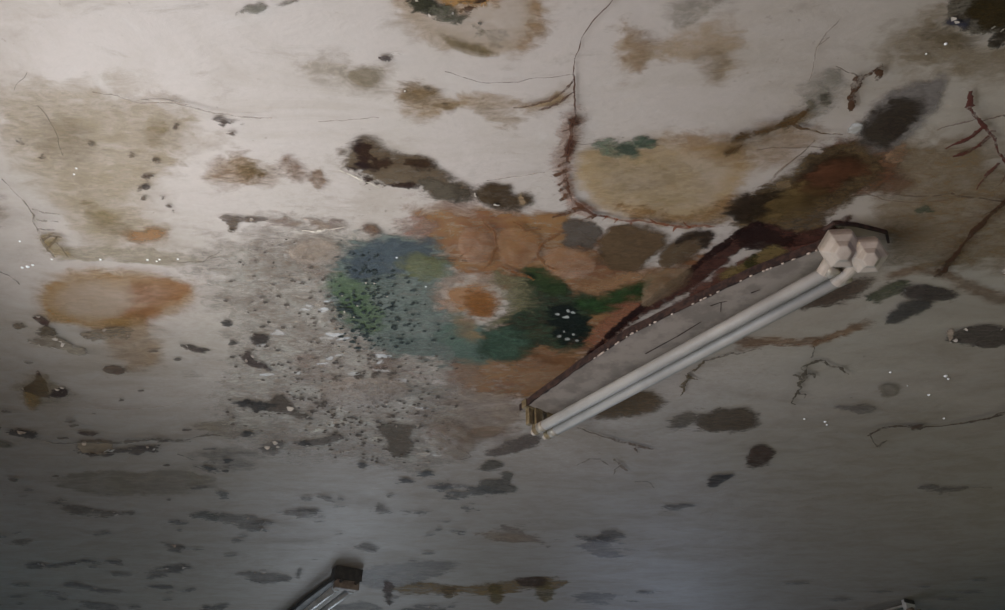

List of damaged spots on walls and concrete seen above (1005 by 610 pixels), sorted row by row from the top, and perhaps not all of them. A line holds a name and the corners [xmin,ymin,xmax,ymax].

leakage [405,0,489,25]
crack [424,0,714,281]
crack [893,91,1005,277]
leakage [129,228,165,242]
leakage [325,79,1005,398]
crack [679,334,849,405]
leakage [596,392,666,420]
leakage [668,408,760,433]
crack [867,412,1004,448]
leakage [362,562,571,606]